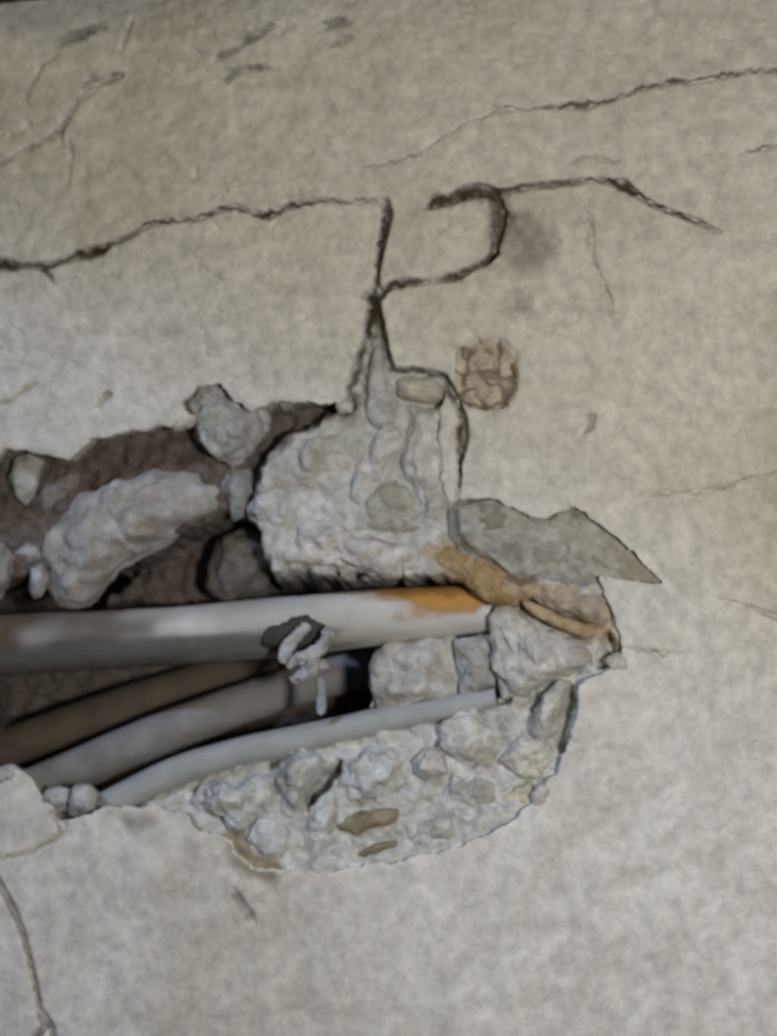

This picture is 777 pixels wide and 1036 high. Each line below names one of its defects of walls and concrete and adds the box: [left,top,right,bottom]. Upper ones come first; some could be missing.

crack [544,69,777,109]
crack [142,200,334,229]
crack [429,178,697,224]
crack [0,243,115,280]
crack [349,206,494,484]
spalling [0,290,663,873]
rust [380,585,485,612]